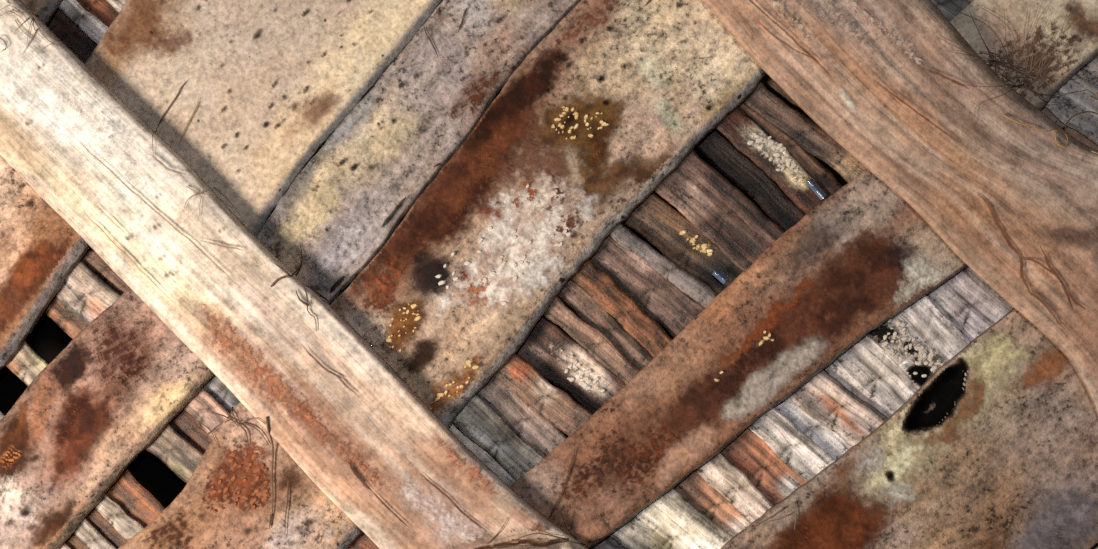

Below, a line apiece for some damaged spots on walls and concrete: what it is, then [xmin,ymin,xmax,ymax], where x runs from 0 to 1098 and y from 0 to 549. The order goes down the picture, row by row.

leakage [348,0,667,314]
corrosion [0,241,67,331]
corrosion [363,257,409,313]
corrosion [667,232,912,432]
crack [977,193,1086,329]